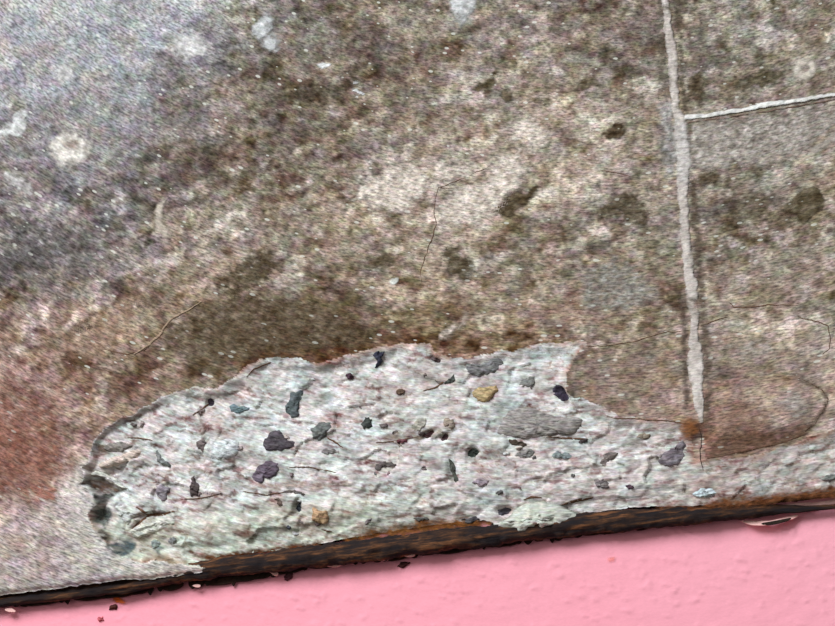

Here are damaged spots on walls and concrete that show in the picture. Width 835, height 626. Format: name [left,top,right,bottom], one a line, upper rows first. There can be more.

crack [791,130,835,152]
rust [0,400,63,499]
spalling [79,340,835,566]
rust [679,417,699,439]
rust [0,486,835,608]